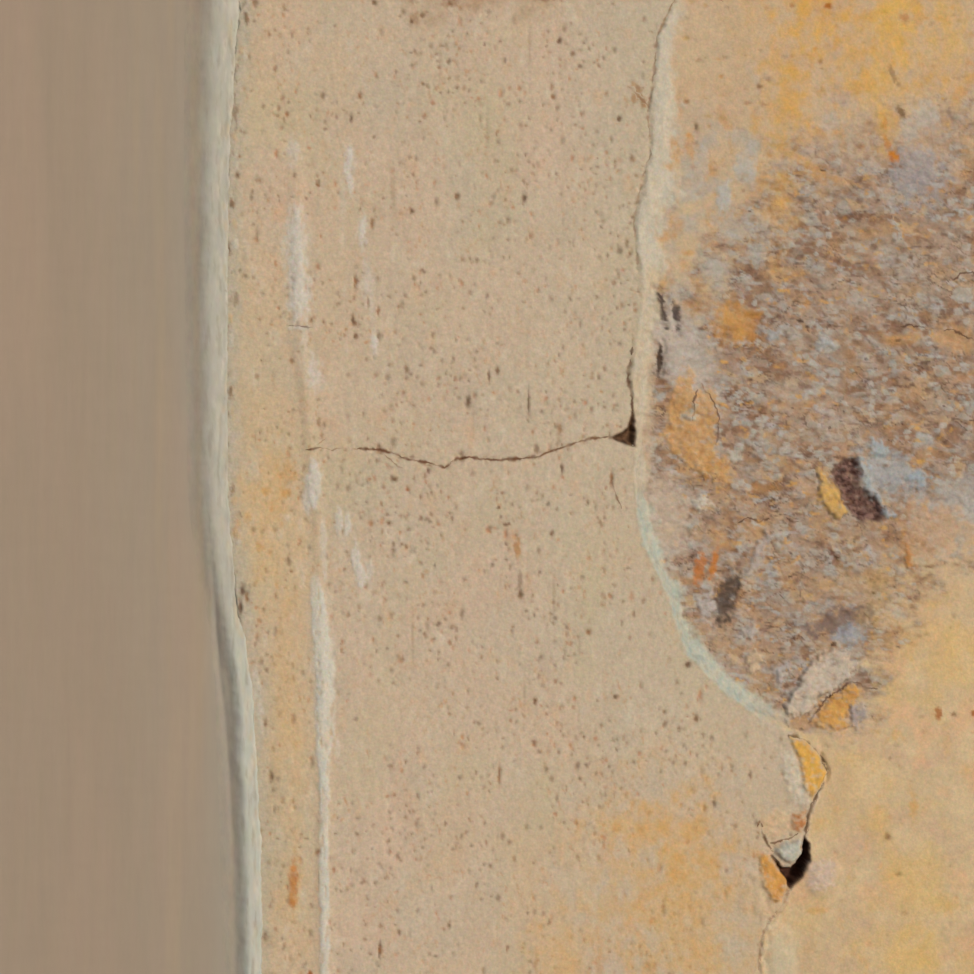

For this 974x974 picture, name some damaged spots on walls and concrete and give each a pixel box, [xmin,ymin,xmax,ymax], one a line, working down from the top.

crack [306,347,638,469]
crack [611,480,622,509]
spalling [628,0,974,760]
crack [756,732,841,974]